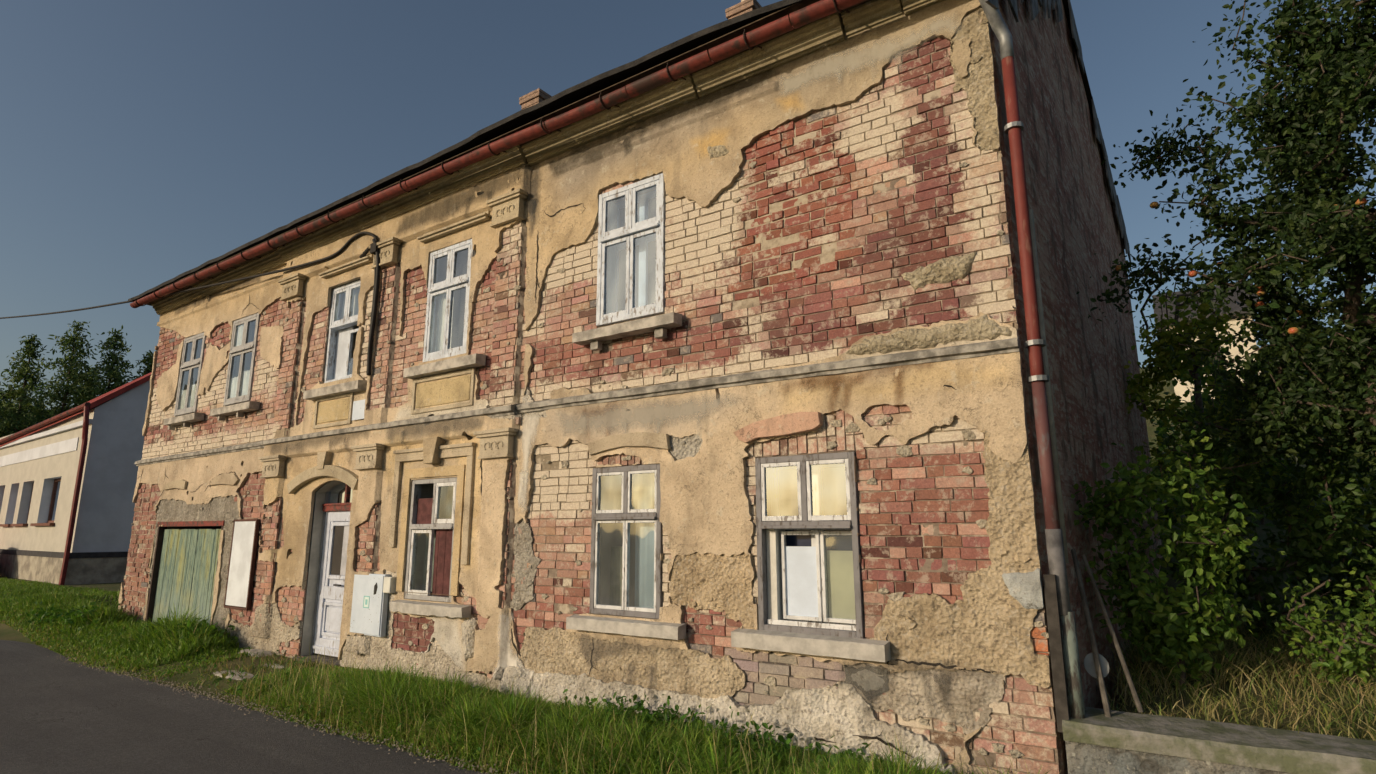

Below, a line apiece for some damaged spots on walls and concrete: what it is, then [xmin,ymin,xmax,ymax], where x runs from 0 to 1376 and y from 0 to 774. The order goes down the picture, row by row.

flaking render [470,7,1019,425]
flaking render [141,296,331,460]
flaking render [359,262,428,410]
flaking render [121,472,308,658]
flaking render [340,502,500,691]
flaking render [456,405,1060,774]